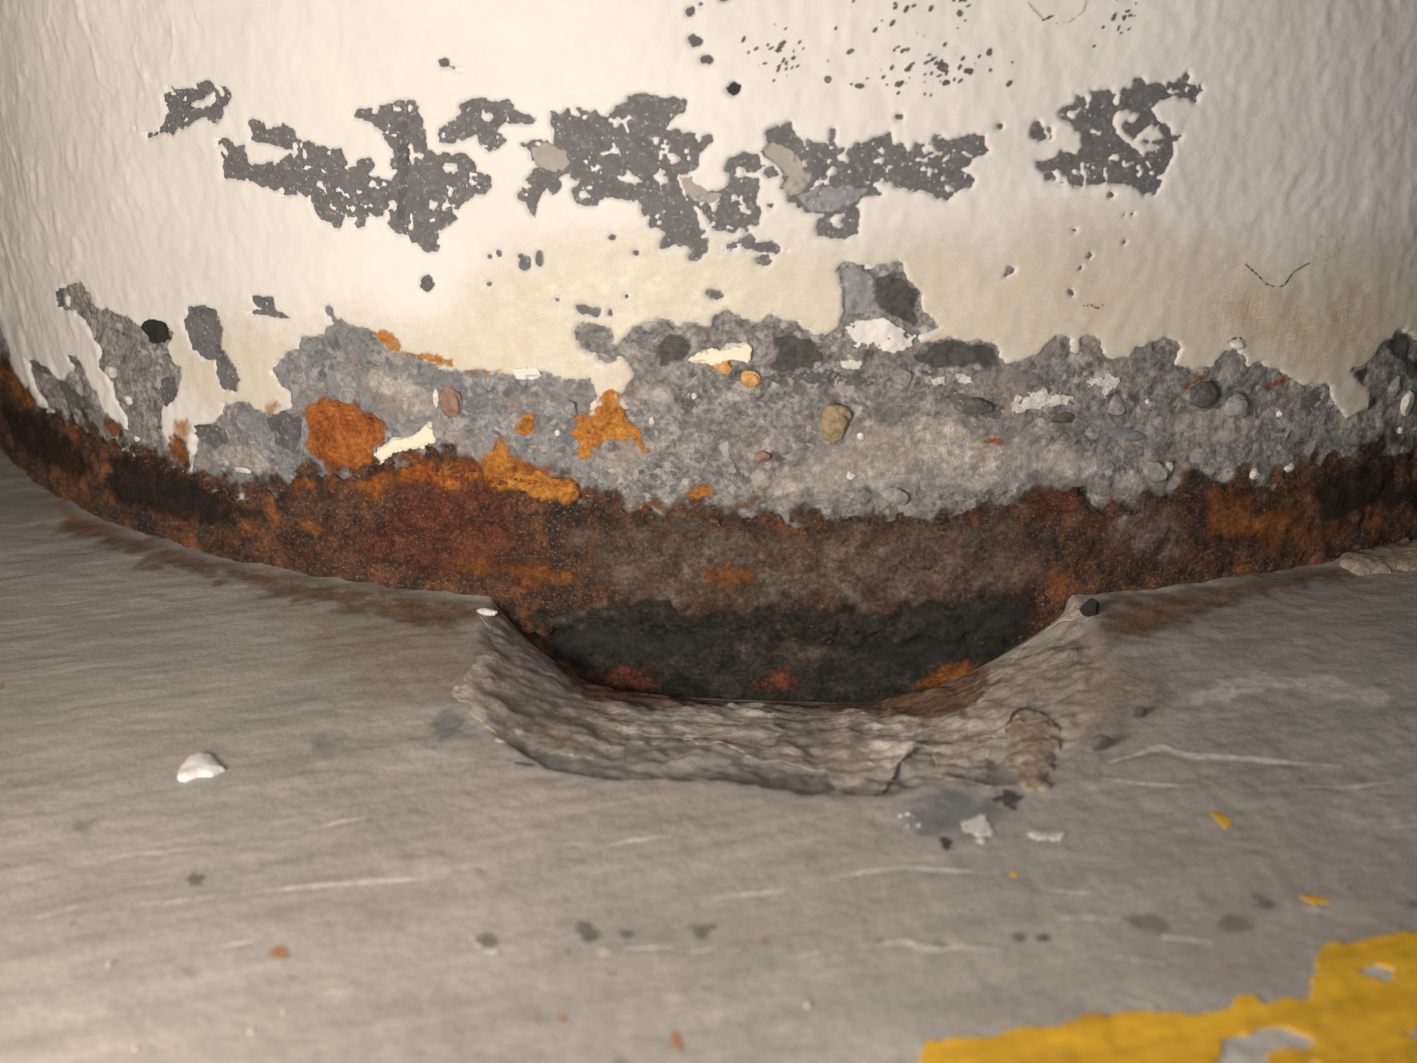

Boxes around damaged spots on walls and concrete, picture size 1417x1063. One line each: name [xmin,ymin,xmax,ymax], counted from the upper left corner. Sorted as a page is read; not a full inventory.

peeling [1101,2,1137,34]
peeling [688,34,713,65]
peeling [741,24,804,82]
peeling [849,0,992,97]
peeling [1030,72,1203,198]
peeling [148,80,1003,266]
peeling [487,250,543,271]
spalling [29,261,1417,529]
rust [0,354,1417,703]
rust [270,945,287,959]
peeling [1359,965,1394,981]
peeling [1215,1028,1316,1063]